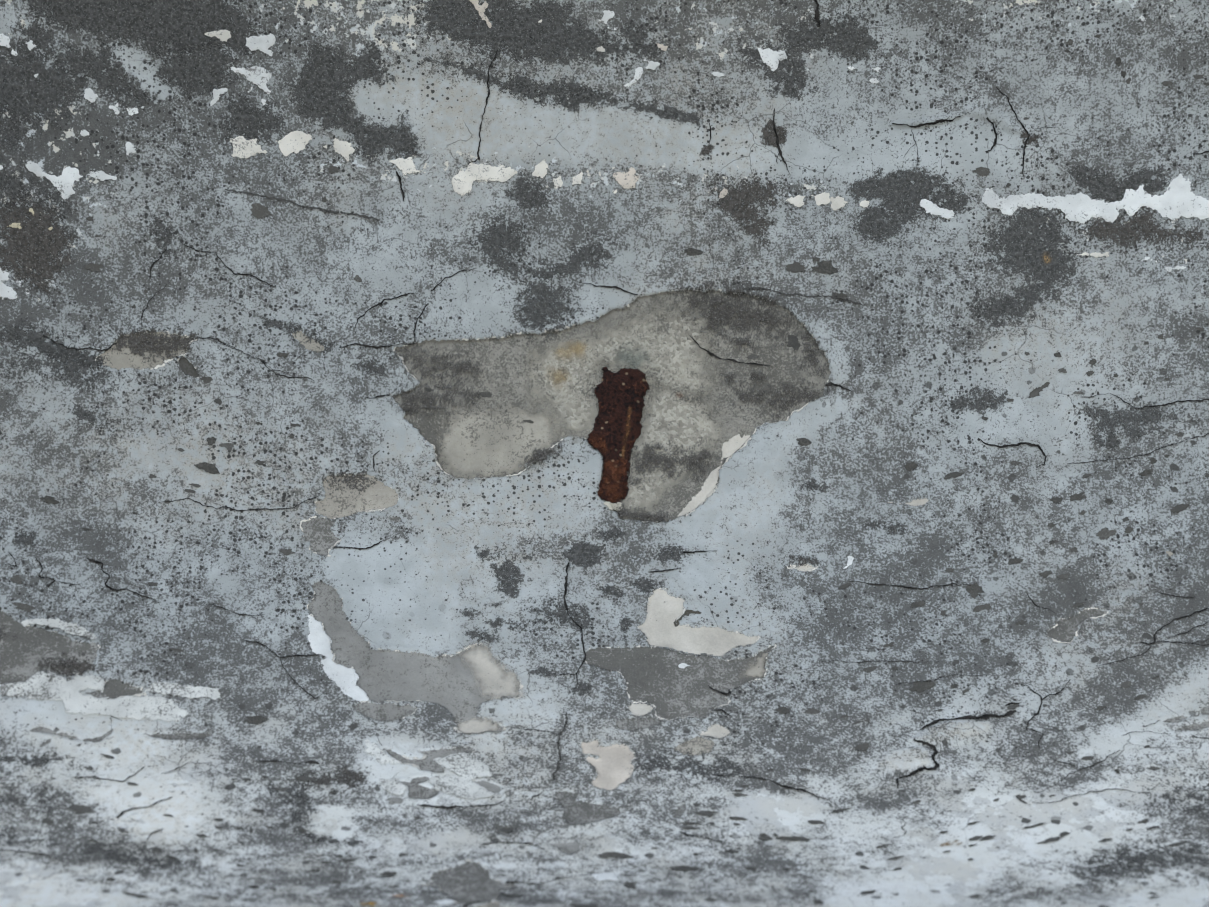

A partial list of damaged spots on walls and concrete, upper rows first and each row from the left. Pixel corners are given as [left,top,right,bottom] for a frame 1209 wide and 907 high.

leakage [0,0,425,298]
crack [468,50,498,164]
peeling [972,167,1209,224]
peeling [94,327,212,384]
crack [340,268,475,349]
peeling [391,274,834,524]
corrosion [587,367,649,511]
peeling [306,582,523,819]
crack [422,560,586,809]
peeling [581,588,777,790]
crack [896,679,1209,803]
crack [1099,592,1209,666]